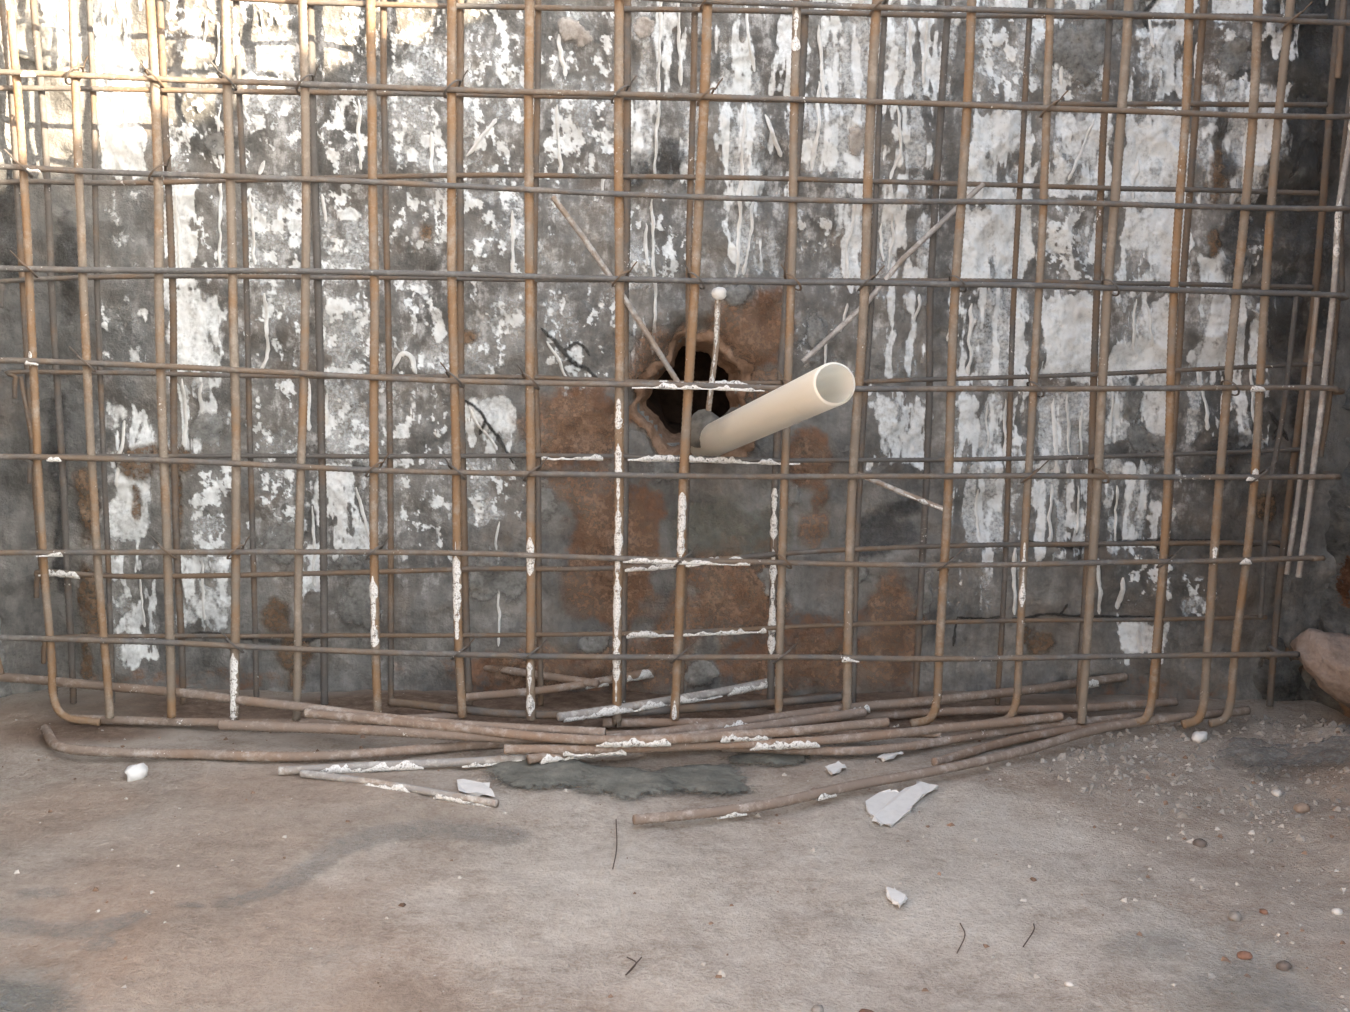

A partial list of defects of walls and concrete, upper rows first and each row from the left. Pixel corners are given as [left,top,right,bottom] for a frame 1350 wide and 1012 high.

leakage [37,0,571,671]
leakage [543,287,615,396]
leakage [541,0,697,361]
spalling [629,328,685,379]
leakage [710,0,962,471]
leakage [860,499,919,556]
leakage [946,0,1334,666]
leakage [1318,307,1339,374]